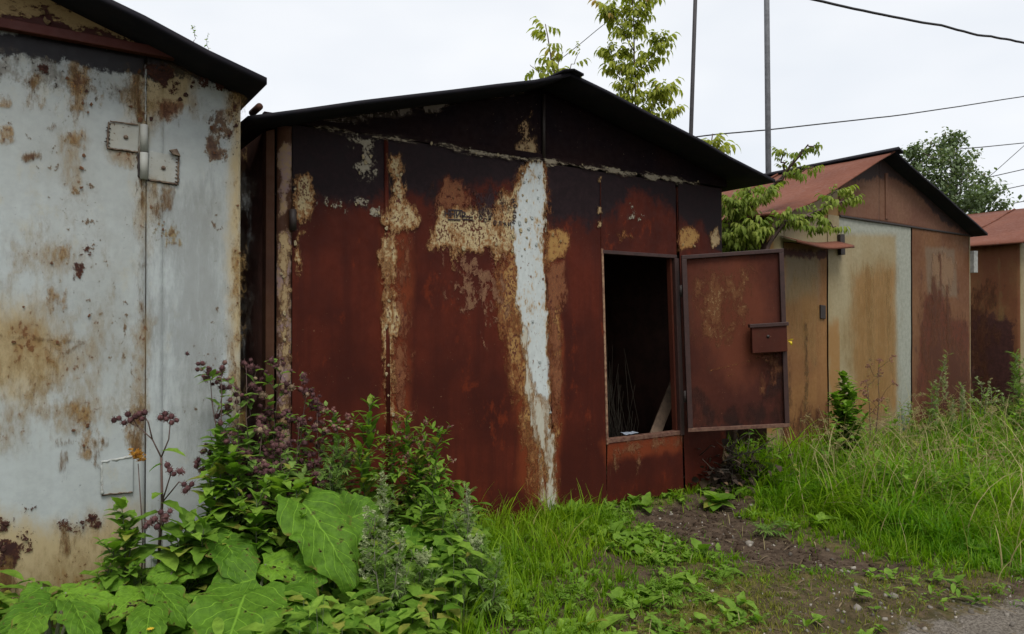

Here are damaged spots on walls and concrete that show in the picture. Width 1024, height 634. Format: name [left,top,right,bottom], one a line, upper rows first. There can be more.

rust [0,58,243,230]
rust [117,148,181,246]
rust [435,175,477,215]
rust [26,235,108,322]
rust [0,299,148,466]
rust [277,231,292,424]
rust [447,254,515,346]
peeling [292,110,699,519]
rust [545,228,570,463]
rust [918,277,1001,431]
rust [0,504,36,593]
rust [53,512,103,586]